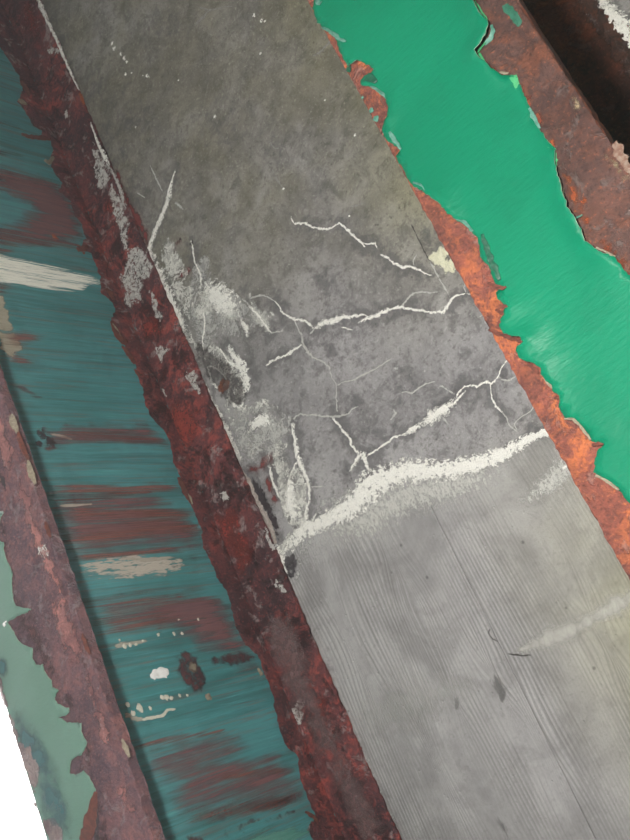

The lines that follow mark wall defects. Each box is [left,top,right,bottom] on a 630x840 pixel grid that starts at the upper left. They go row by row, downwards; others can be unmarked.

rust [575,0,630,78]
rust [612,140,630,173]
rust [36,425,161,450]
peeling [0,0,346,840]
crack [242,218,533,473]
peeling [321,0,630,580]
rust [0,414,110,744]
rust [178,651,212,700]
rust [0,677,63,840]
rust [79,791,108,840]